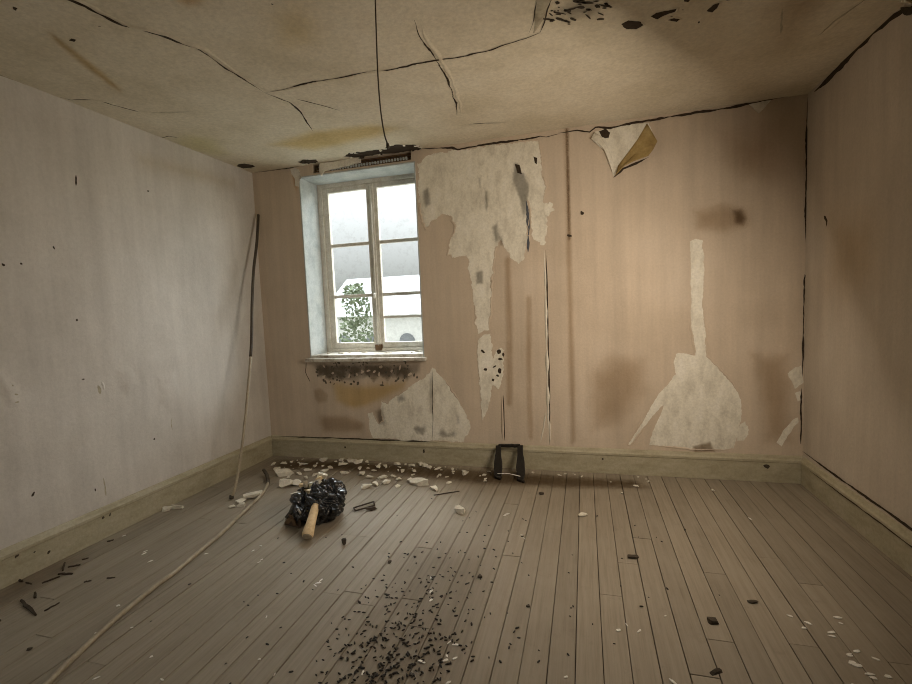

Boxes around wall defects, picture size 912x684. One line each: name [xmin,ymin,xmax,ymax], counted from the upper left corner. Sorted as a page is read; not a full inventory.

damp [543,0,612,25]
spalling [620,0,690,31]
crack [61,0,783,150]
peeling [299,139,554,420]
damp [316,361,418,386]
peeling [368,367,470,453]
peeling [627,239,749,451]